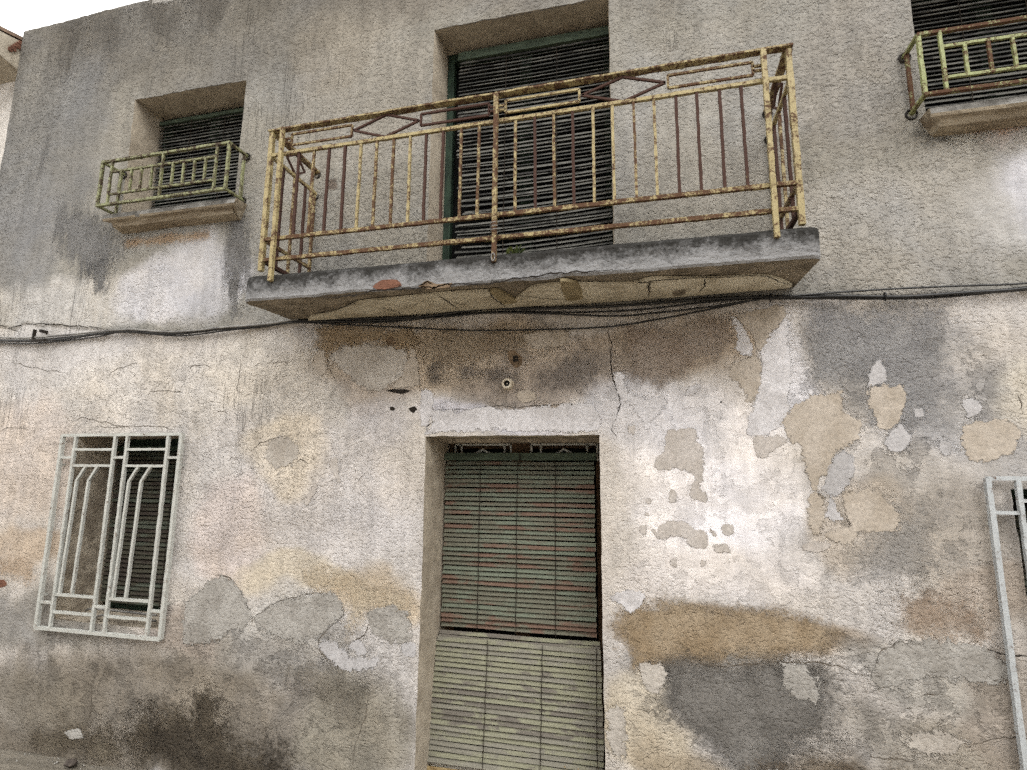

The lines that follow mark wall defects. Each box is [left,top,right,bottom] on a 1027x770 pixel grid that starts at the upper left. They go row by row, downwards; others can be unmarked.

water stain [625,317,735,387]
peeling [728,304,901,545]
peeling [866,360,924,452]
peeling [960,398,1021,463]
peeling [318,638,380,674]
water stain [612,599,855,770]